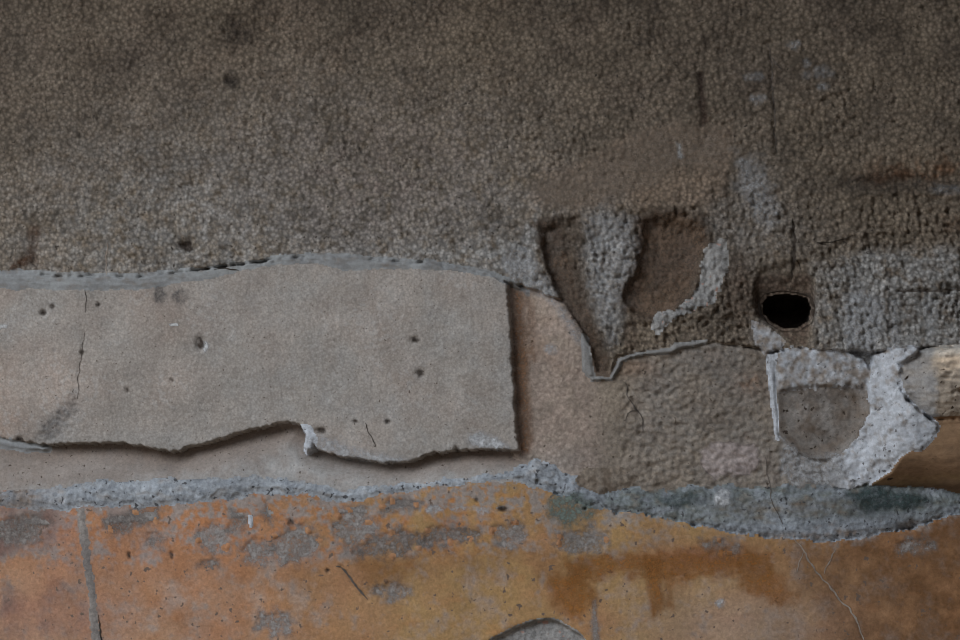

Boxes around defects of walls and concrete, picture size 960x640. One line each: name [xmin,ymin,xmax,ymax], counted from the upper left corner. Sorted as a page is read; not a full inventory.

crack [77,292,87,399]
spalling [536,220,608,375]
spalling [619,209,729,335]
spalling [766,345,871,462]
spalling [489,618,586,640]